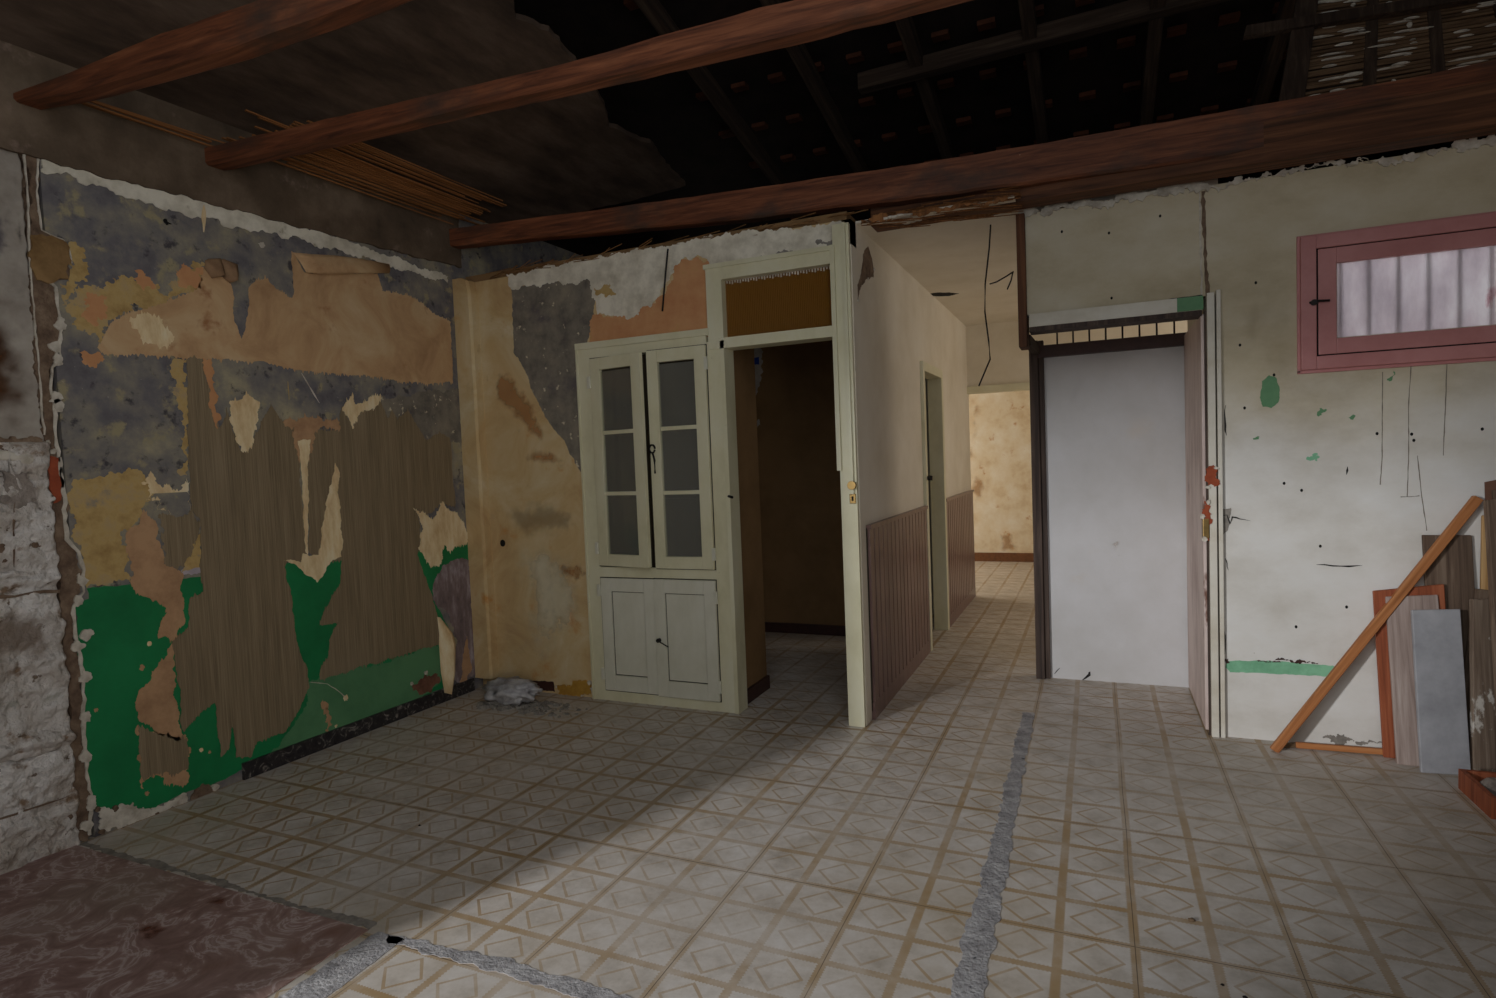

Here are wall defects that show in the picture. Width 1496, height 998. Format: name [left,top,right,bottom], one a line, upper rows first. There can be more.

peeling [60,241,239,368]
flaking render [41,159,448,282]
flaking render [506,221,842,472]
flaking render [857,247,875,302]
flaking render [861,134,1496,225]
peeling [67,468,469,834]